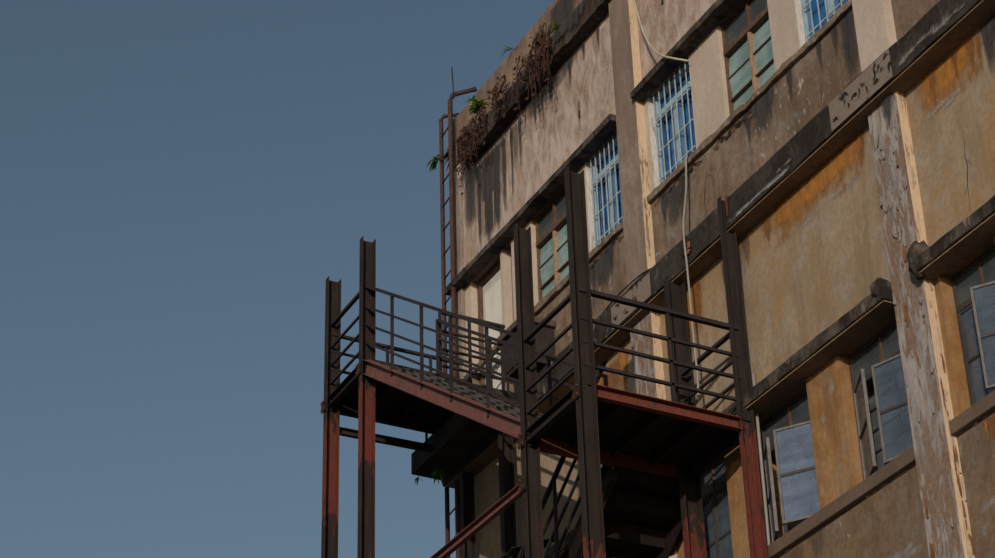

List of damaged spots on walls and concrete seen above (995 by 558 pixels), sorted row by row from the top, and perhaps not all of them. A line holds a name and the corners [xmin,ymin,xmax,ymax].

water stain [541,0,584,55]
water stain [980,13,995,65]
peeling [828,48,893,131]
water stain [464,44,585,241]
rust [598,352,627,388]
peeling [950,446,975,558]